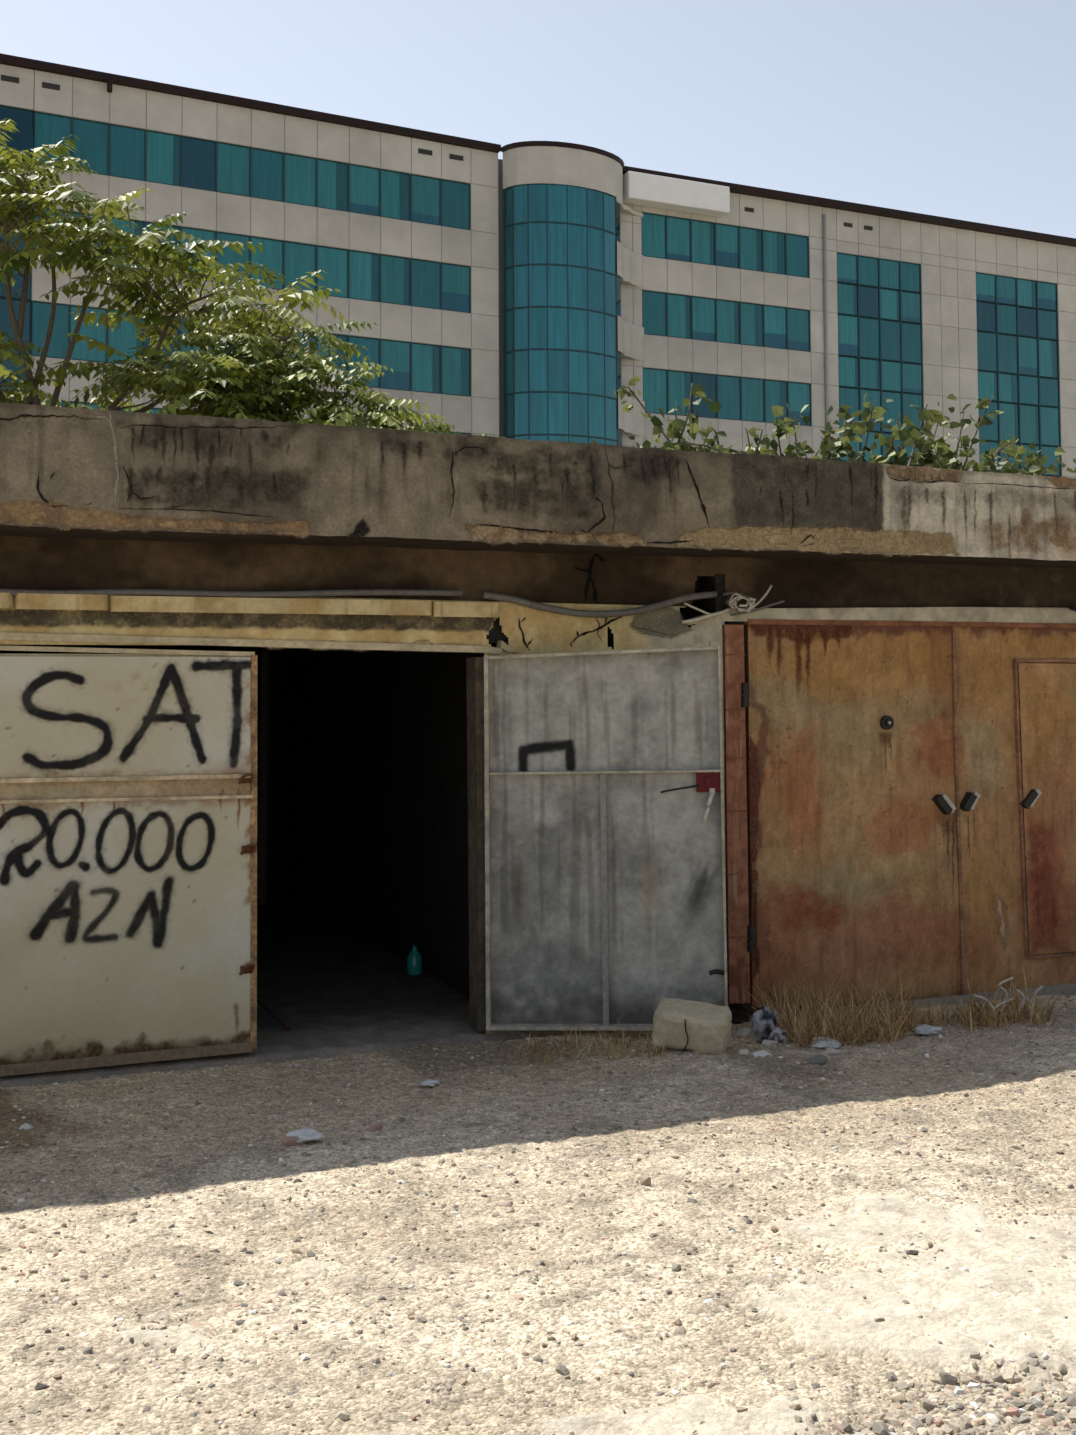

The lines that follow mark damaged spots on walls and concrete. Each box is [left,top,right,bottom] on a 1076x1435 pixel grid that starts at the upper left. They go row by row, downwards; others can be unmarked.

crack [0,407,286,517]
damp [129,423,294,505]
crack [450,446,675,651]
crack [647,459,710,544]
damp [902,489,946,527]
damp [964,493,1011,548]
corrosion [751,624,851,681]